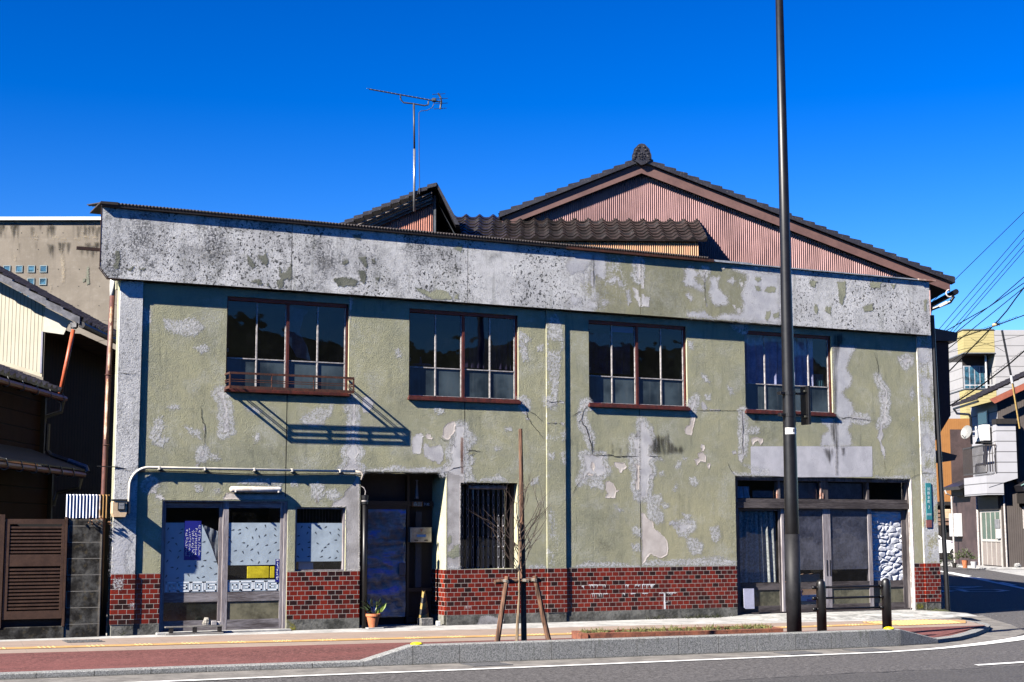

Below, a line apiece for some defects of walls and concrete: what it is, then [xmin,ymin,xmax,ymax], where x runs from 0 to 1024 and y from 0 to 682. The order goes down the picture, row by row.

peeling [142,307,210,354]
peeling [516,251,651,420]
peeling [683,264,781,335]
peeling [147,405,179,448]
peeling [184,384,263,467]
peeling [299,393,509,571]
crack [526,401,662,457]
peeling [547,398,737,568]
leakage [653,437,681,453]
peeling [819,343,892,458]